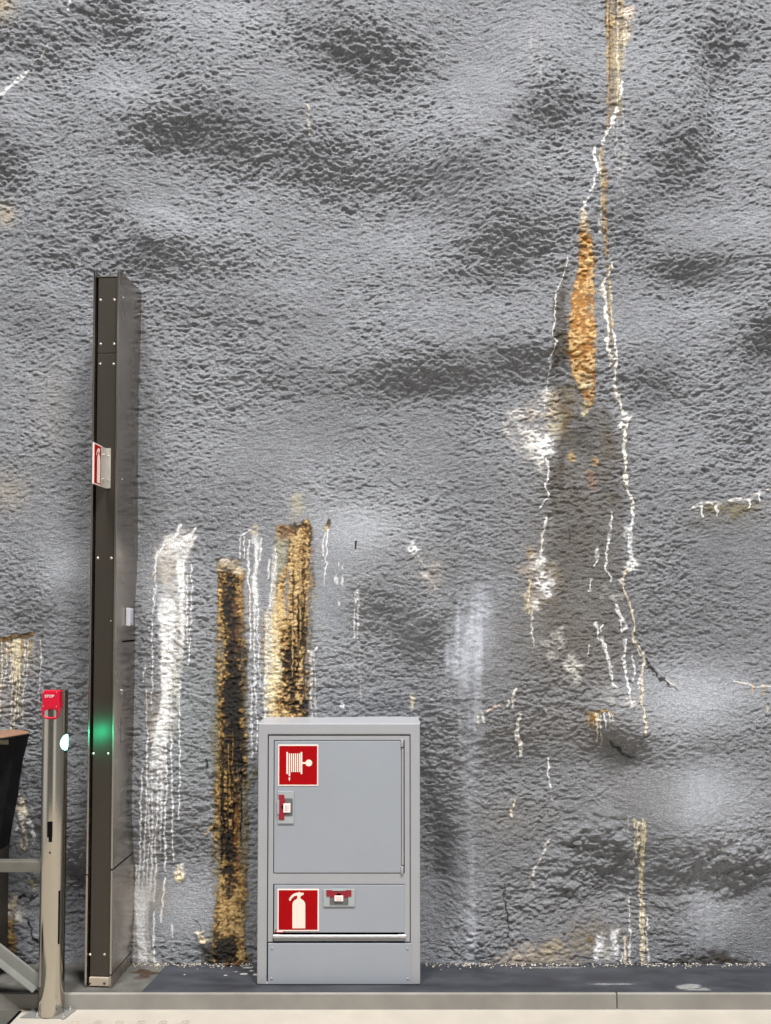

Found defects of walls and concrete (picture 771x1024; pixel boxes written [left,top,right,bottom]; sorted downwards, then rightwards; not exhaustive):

crack [582,81,623,233]
corrosion [605,0,635,133]
crack [543,258,569,409]
corrosion [568,150,620,416]
corrosion [0,632,43,729]
water stain [134,524,197,963]
water stain [239,526,271,759]
corrosion [201,519,330,964]
crack [527,456,550,643]
water stain [510,387,591,489]
crack [587,262,677,737]
water stain [593,817,650,964]